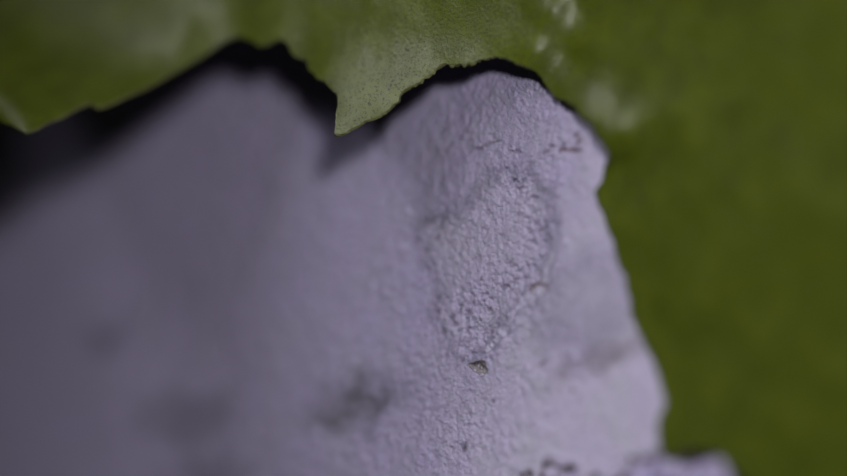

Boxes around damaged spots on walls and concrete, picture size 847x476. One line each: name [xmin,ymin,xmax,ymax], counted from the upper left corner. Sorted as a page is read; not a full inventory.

peeling [0,0,676,186]
spalling [414,169,560,376]
peeling [595,0,847,476]